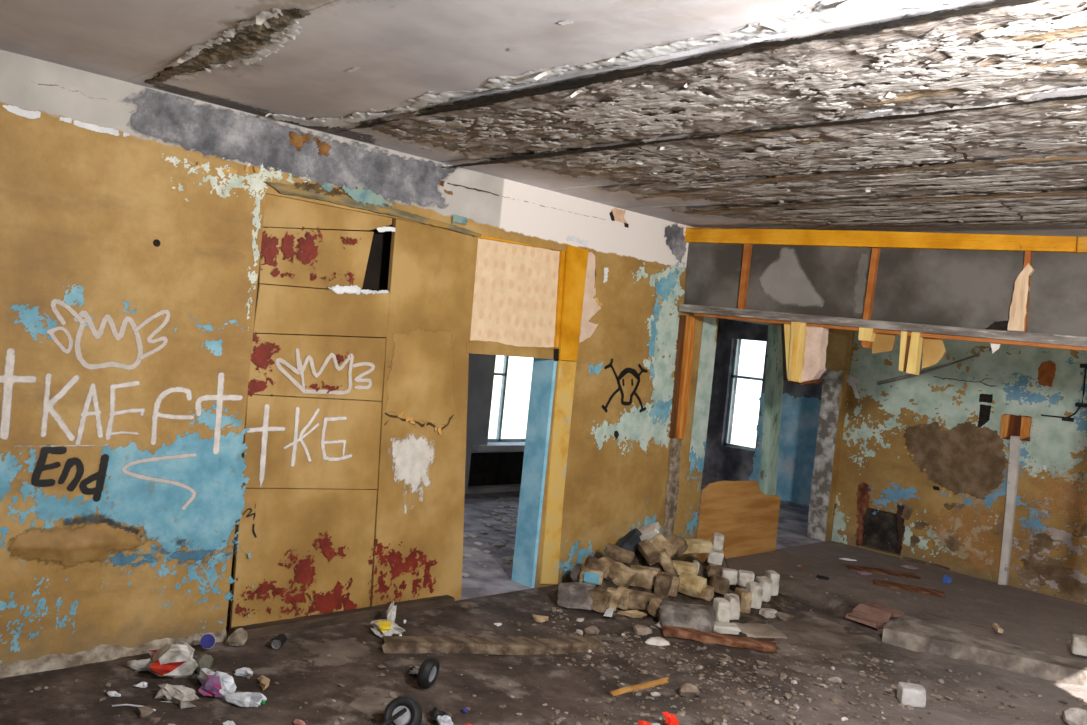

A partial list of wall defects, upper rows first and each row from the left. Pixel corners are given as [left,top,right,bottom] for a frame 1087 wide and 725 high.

spalling [144,8,311,85]
peeling [265,0,1087,228]
peeling [7,302,57,343]
peeling [60,280,94,327]
spalling [985,321,1019,332]
peeling [588,260,717,541]
peeling [749,392,765,486]
peeling [776,331,1087,603]
peeling [0,401,357,629]
corrosion [855,482,871,546]
peeling [368,536,438,604]
peeling [0,576,81,666]